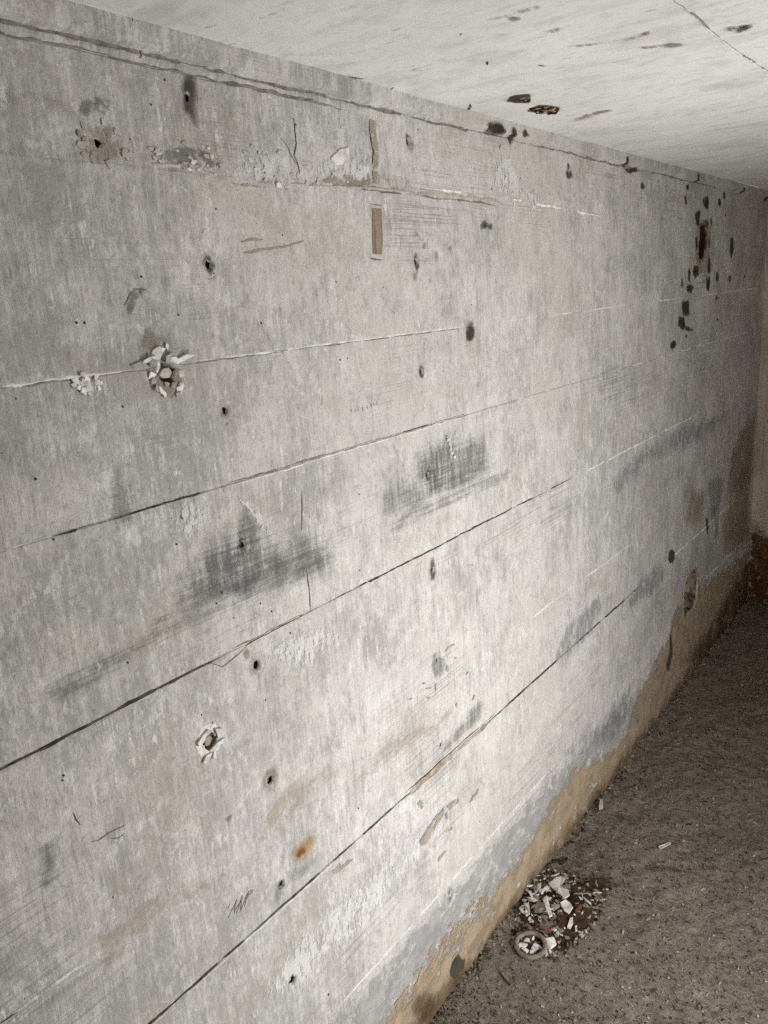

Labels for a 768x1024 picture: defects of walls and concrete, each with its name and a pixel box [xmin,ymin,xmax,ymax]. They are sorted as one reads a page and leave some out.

crack [675,2,768,71]
spalling [71,98,134,169]
peeling [147,141,222,176]
spalling [70,372,103,396]
spalling [130,332,194,398]
spalling [196,721,225,764]
damp [334,420,754,1024]
corrosion [296,838,314,861]